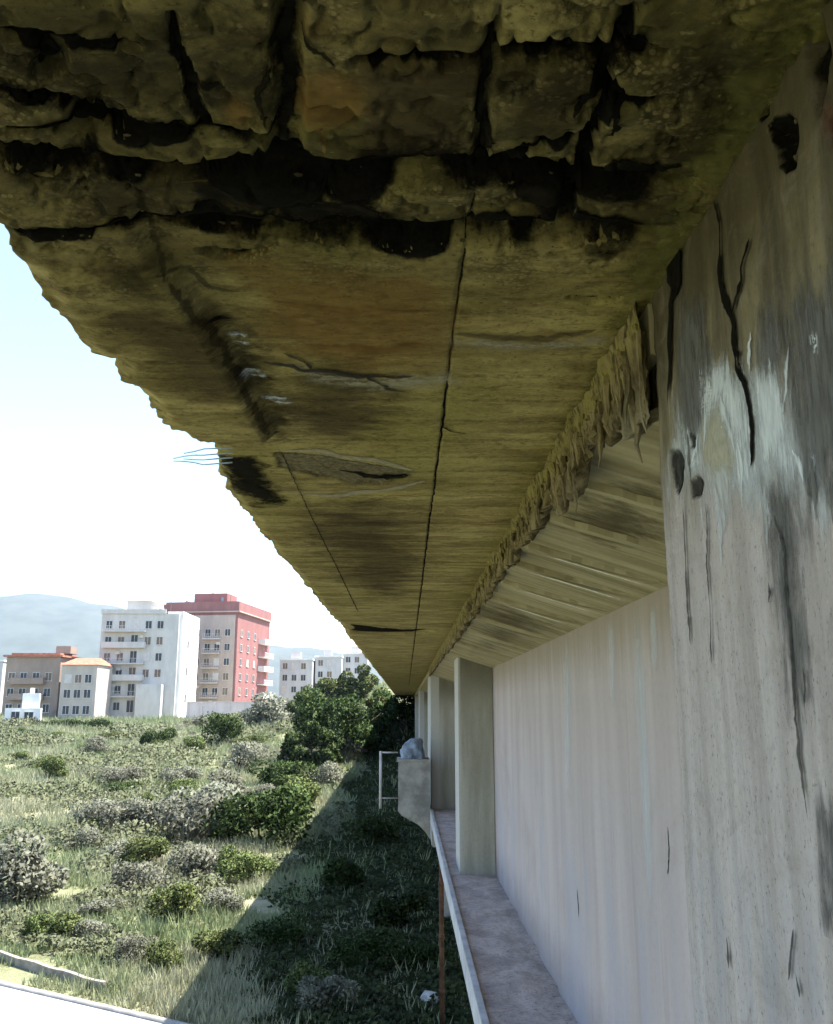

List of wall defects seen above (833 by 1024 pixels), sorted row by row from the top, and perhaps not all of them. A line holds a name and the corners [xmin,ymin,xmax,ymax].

damp [363,53,475,155]
spalling [759,113,800,174]
crack [0,0,682,682]
crack [713,201,754,467]
damp [219,455,288,508]
spalling [275,449,424,497]
spalling [428,300,659,677]
spalling [670,433,704,498]
damp [673,261,833,701]
damp [816,796,833,931]